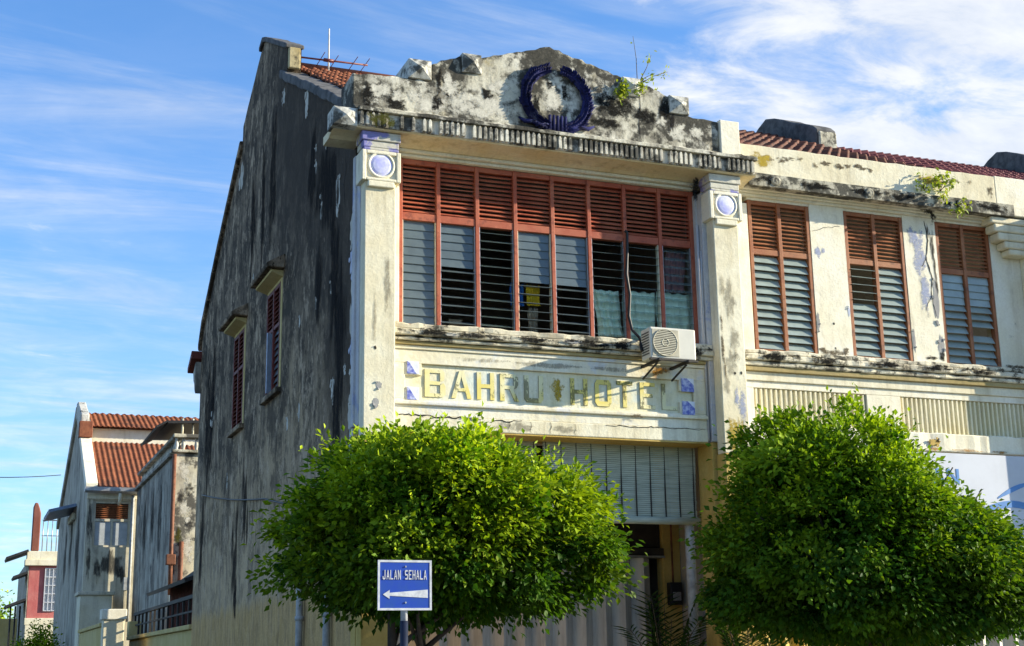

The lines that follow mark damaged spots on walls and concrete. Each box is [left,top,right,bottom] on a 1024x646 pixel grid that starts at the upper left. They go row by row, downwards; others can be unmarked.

water stain [360,84,405,127]
water stain [432,69,459,110]
water stain [592,92,675,129]
water stain [802,182,835,190]
water stain [945,188,1007,213]
water stain [308,132,346,444]
peeling [908,228,946,357]
crack [922,223,936,313]
water stain [409,328,547,344]
water stain [763,348,849,364]
water stain [917,352,1024,375]
water stain [178,357,216,579]